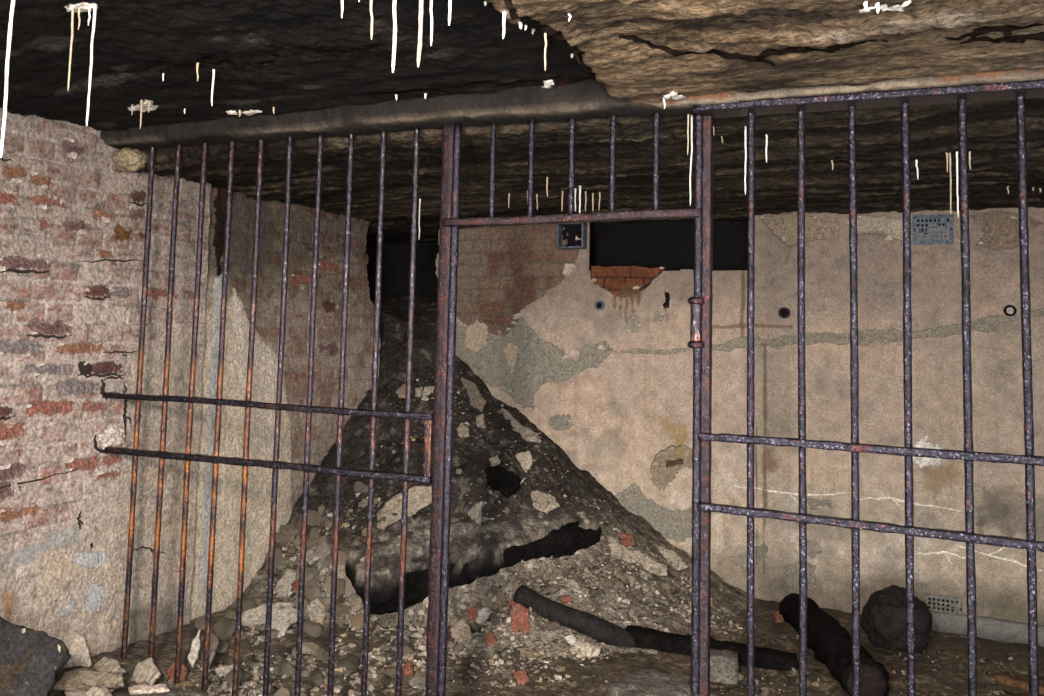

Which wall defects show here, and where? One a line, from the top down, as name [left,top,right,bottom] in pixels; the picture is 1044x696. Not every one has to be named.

damp [64,2,97,13]
damp [128,100,158,112]
flaking render [590,266,666,298]
flaking render [456,224,613,409]